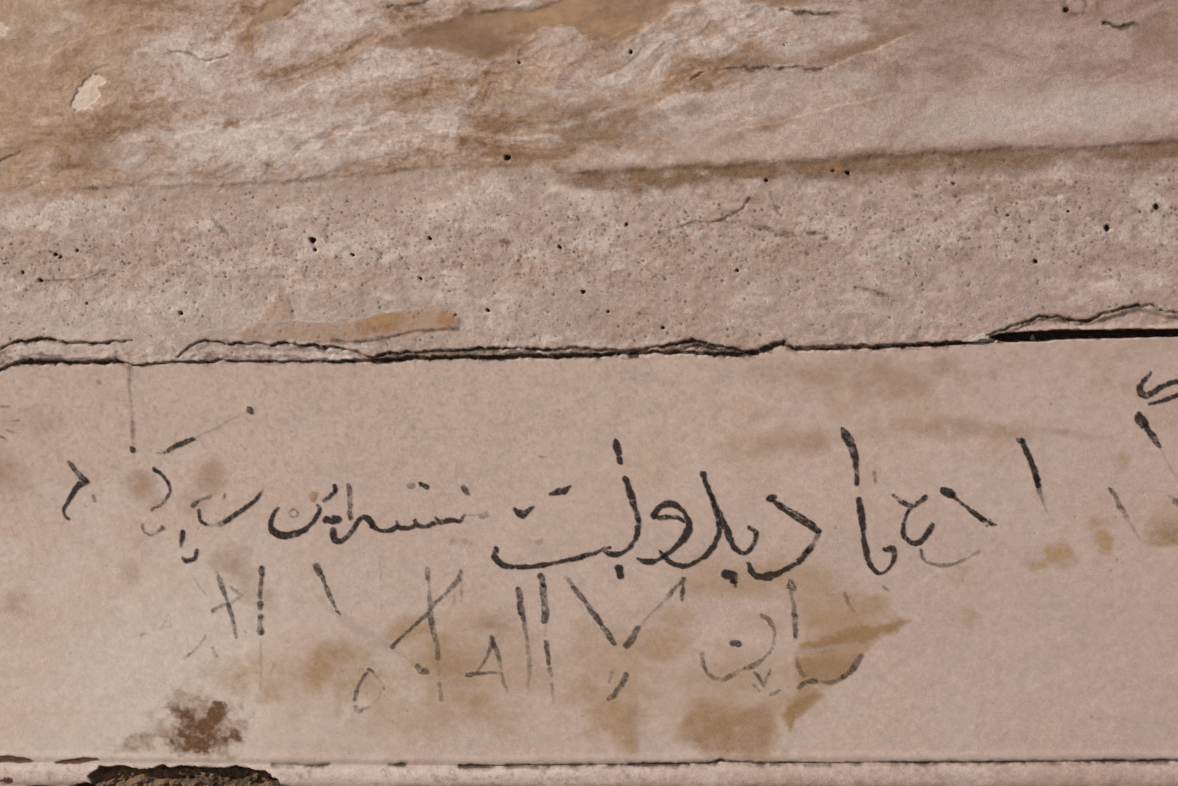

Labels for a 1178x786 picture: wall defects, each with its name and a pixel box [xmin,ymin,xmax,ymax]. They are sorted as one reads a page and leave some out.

flaking render [396,0,668,59]
flaking render [71,74,106,112]
crack [0,337,145,366]
crack [190,303,1178,364]
leakage [165,697,241,753]